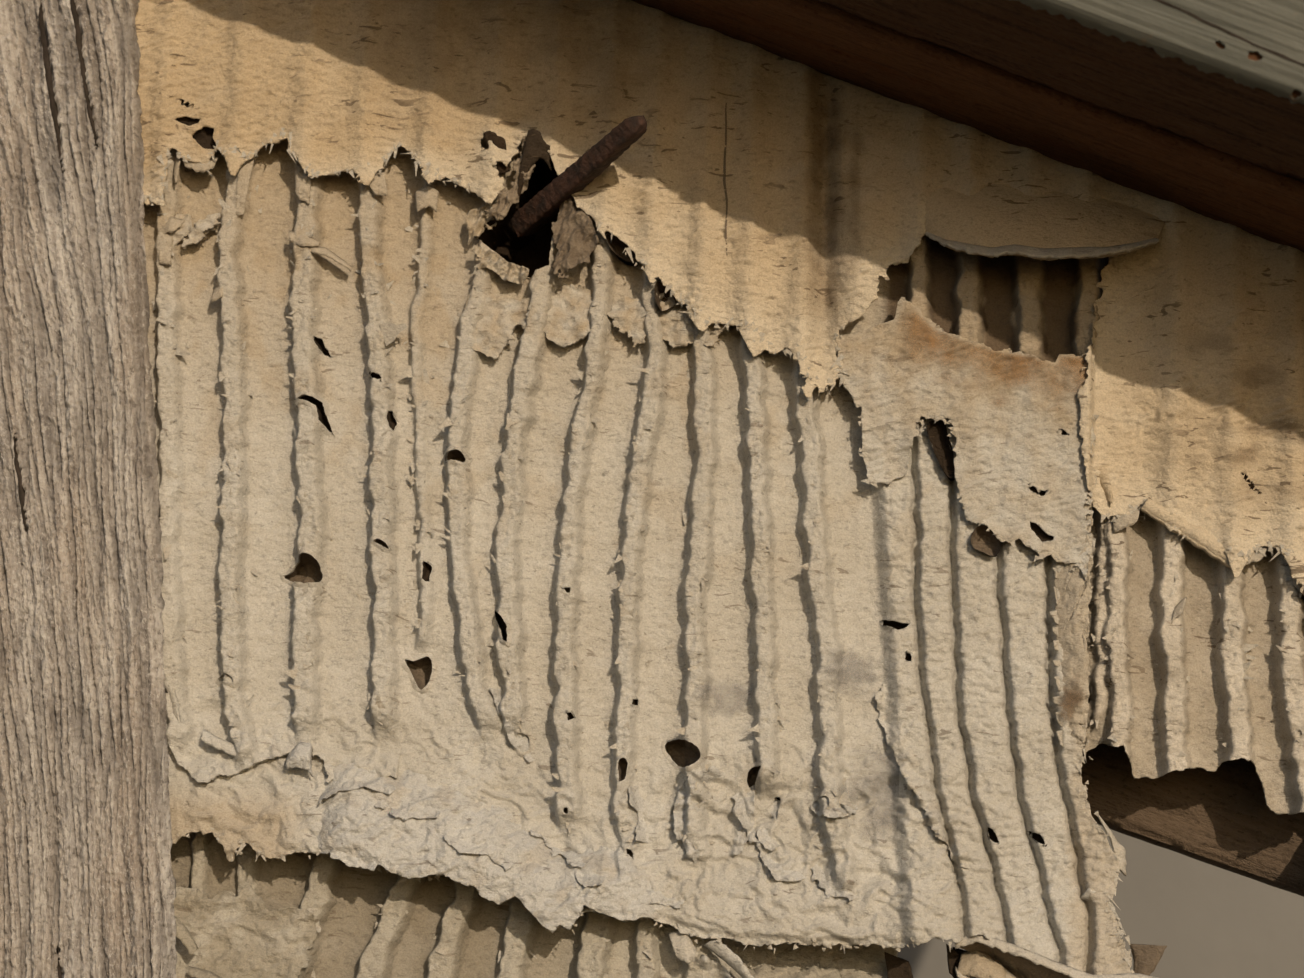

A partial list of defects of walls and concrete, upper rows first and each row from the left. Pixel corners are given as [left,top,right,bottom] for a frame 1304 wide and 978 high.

peeling [173,154,218,184]
peeling [295,172,312,205]
peeling [289,231,352,272]
peeling [415,185,439,212]
peeling [924,184,1165,261]
peeling [1049,467,1267,749]
peeling [164,680,401,783]
peeling [875,683,970,869]
peeling [1095,811,1127,876]
peeling [173,885,318,978]
peeling [668,931,898,978]
peeling [946,888,1167,978]